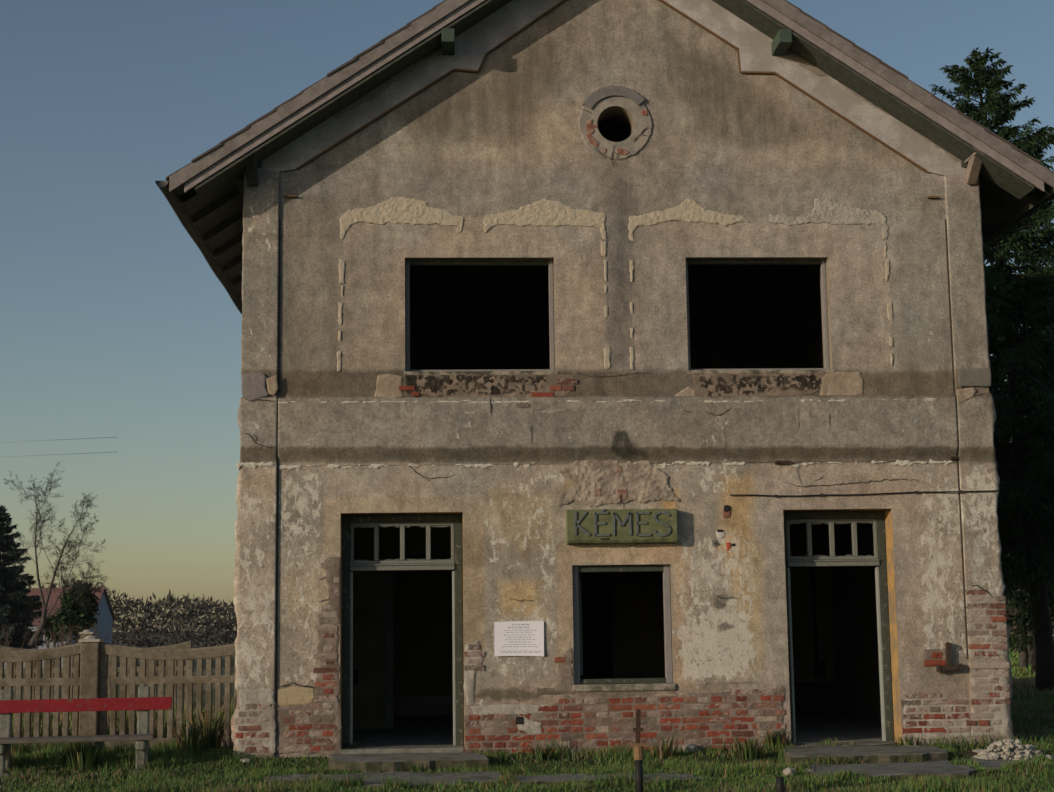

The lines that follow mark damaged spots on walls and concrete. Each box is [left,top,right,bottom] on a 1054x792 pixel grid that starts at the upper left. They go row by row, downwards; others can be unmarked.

spalling [340,197,464,239]
spalling [628,198,750,242]
spalling [337,259,345,371]
peeling [342,374,580,407]
peeling [655,371,864,403]
peeling [236,461,389,469]
peeling [557,460,711,508]
crack [782,463,924,487]
spalling [712,505,735,551]
flaking render [234,556,342,755]
flaking render [901,537,1010,740]
flaking render [462,640,785,754]